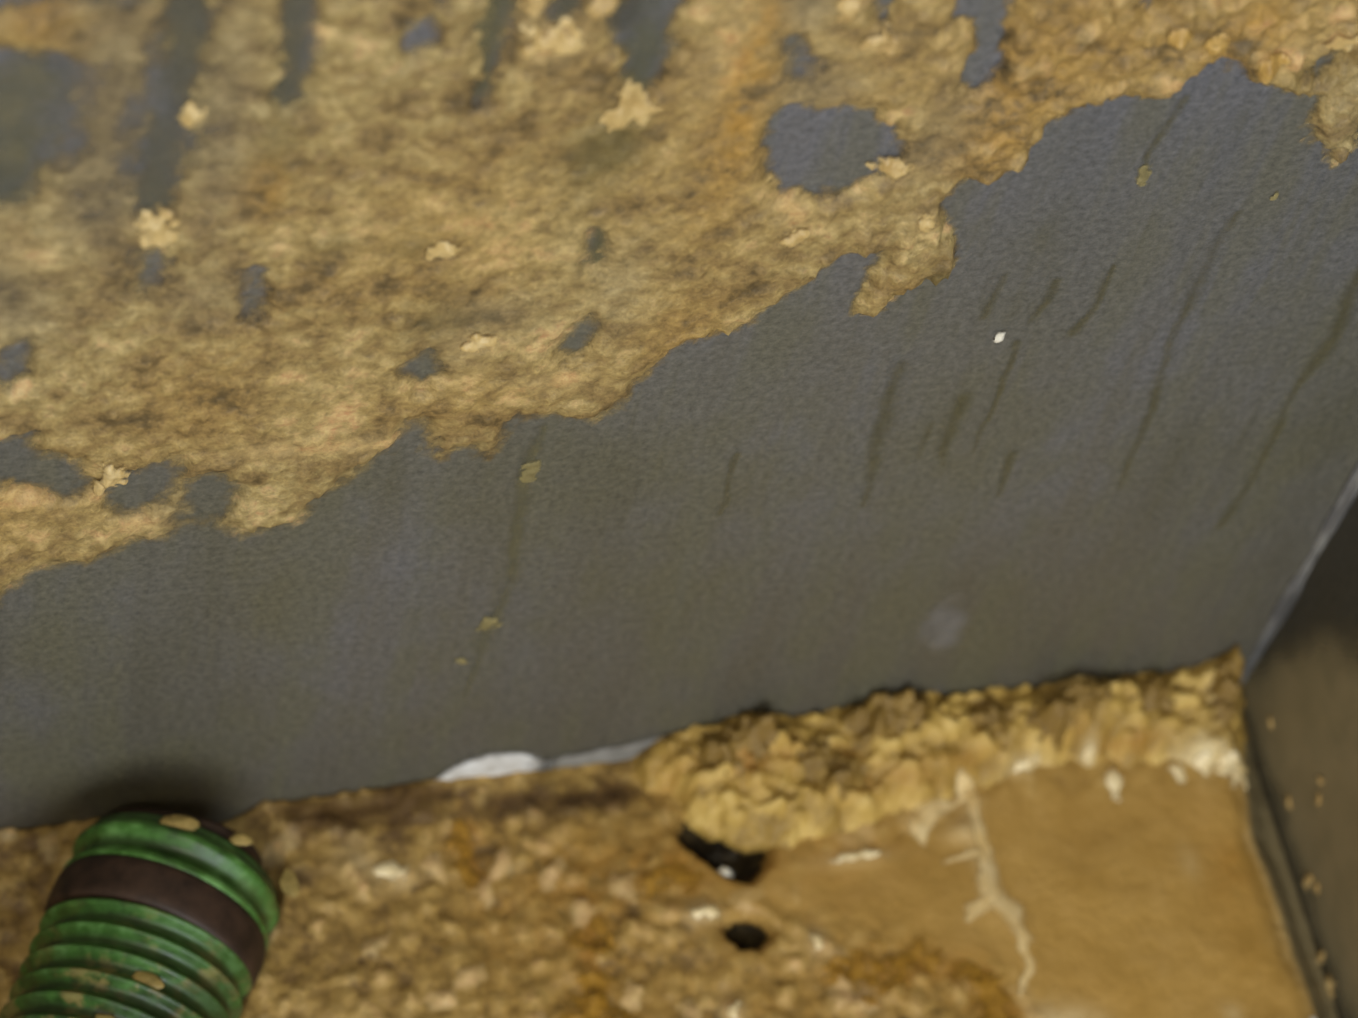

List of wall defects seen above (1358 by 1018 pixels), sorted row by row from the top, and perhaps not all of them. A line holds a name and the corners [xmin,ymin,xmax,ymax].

water stain [268,0,310,106]
water stain [141,120,176,213]
peeling [0,0,1358,595]
peeling [691,904,719,920]
crack [909,771,1035,996]